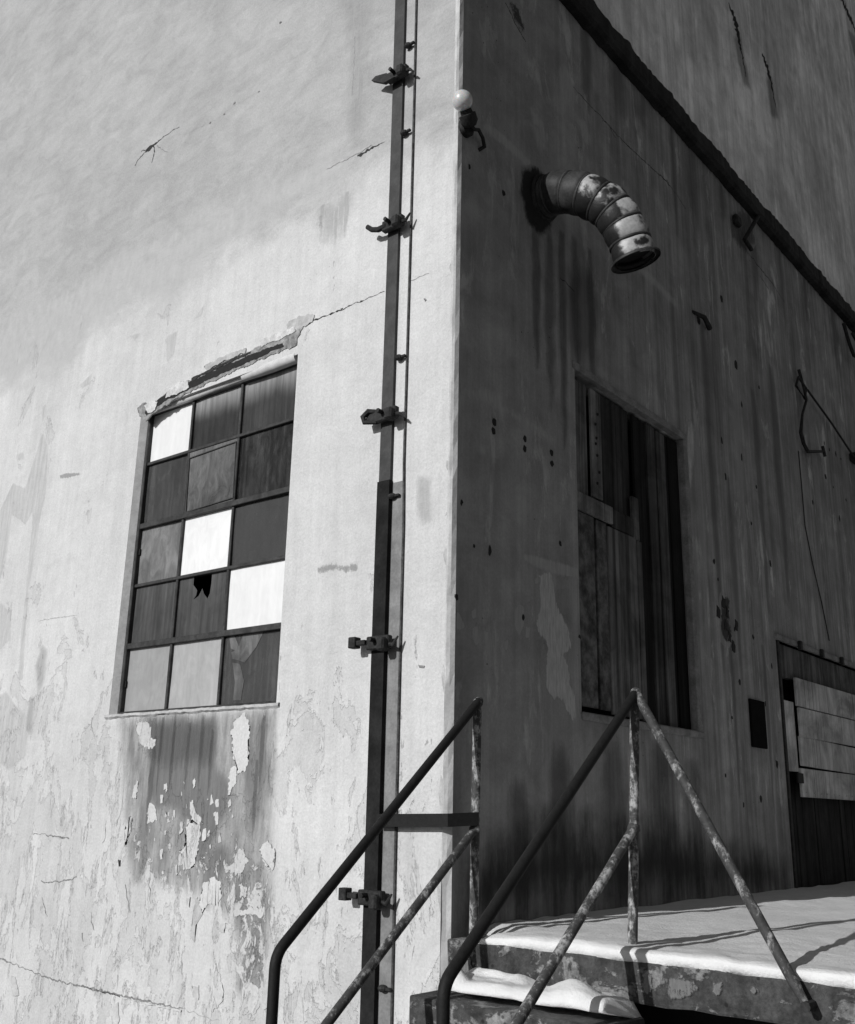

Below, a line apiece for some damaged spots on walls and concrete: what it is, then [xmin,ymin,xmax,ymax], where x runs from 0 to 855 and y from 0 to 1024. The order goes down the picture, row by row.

crack [135,91,260,165]
crack [327,142,384,169]
crack [309,291,384,324]
peeling [0,110,377,773]
peeling [124,816,133,847]
peeling [147,712,250,903]
water stain [113,694,284,1024]
peeling [187,848,264,942]
peeling [259,840,276,871]
peeling [242,982,268,1015]